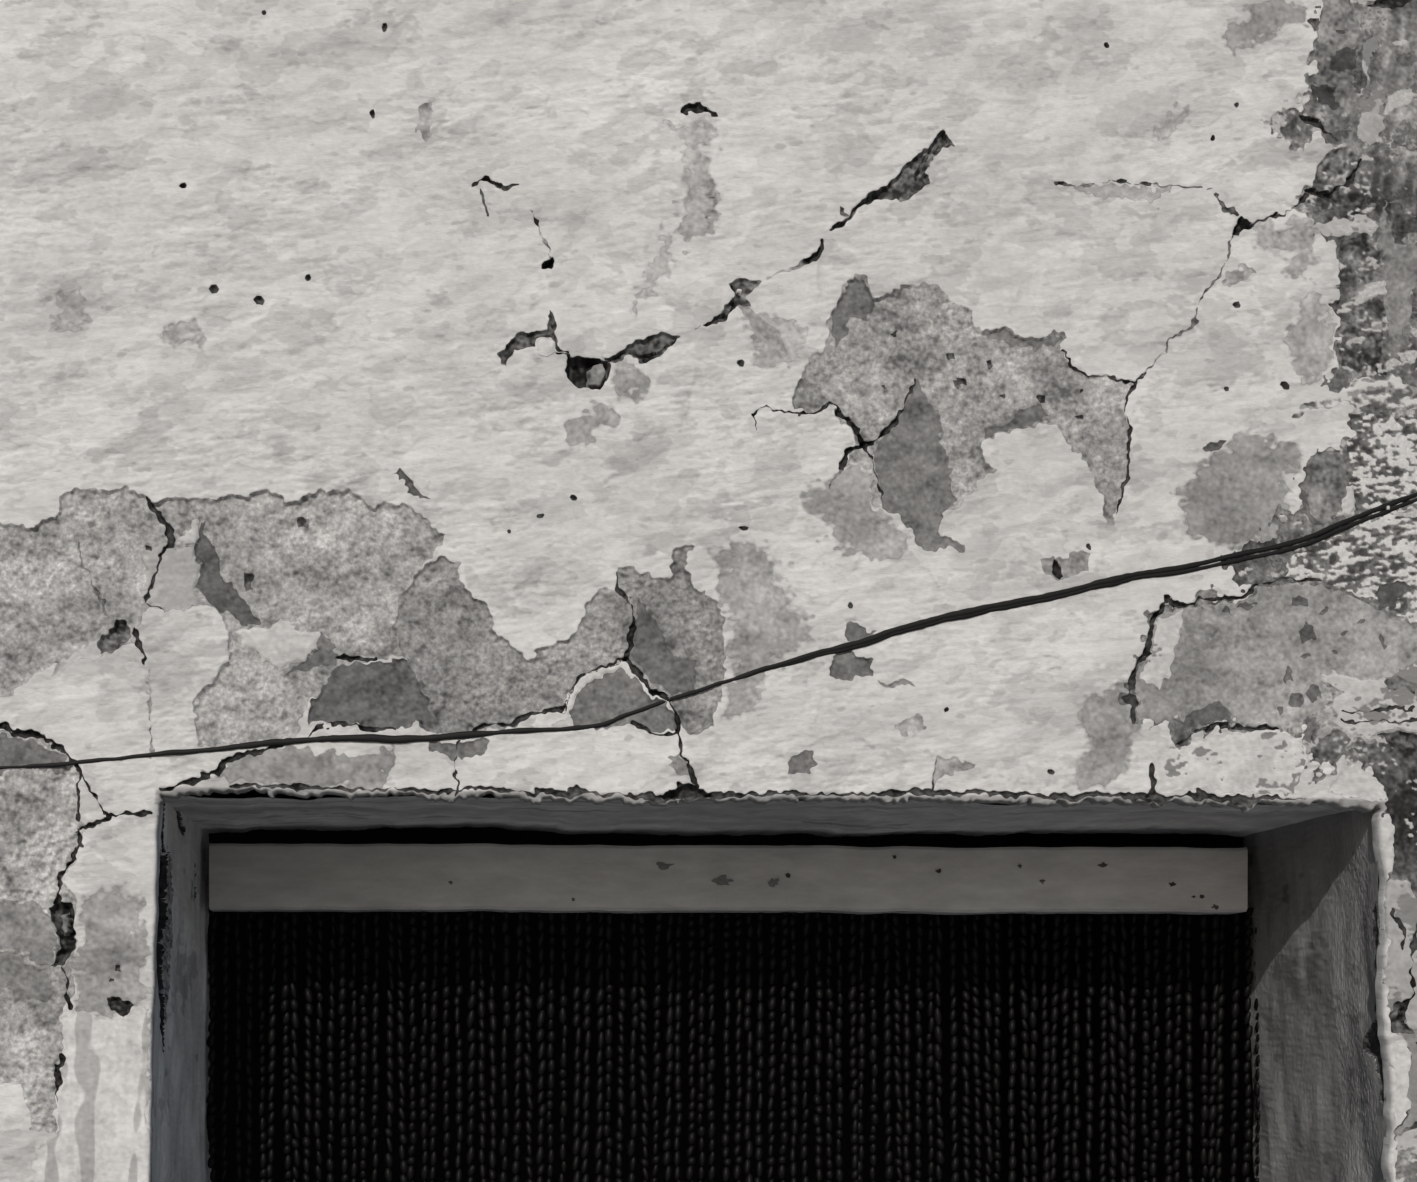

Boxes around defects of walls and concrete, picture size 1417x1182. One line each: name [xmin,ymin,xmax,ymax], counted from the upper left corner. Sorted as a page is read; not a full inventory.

spalling [0,468,817,790]
crack [472,175,554,269]
crack [696,130,955,329]
crack [751,378,916,506]
spalling [792,274,1134,561]
crack [1054,179,1309,513]
spalling [1075,0,1417,1182]
crack [54,1053,66,1102]
spalling [0,730,151,1182]
crack [0,572,1322,1054]